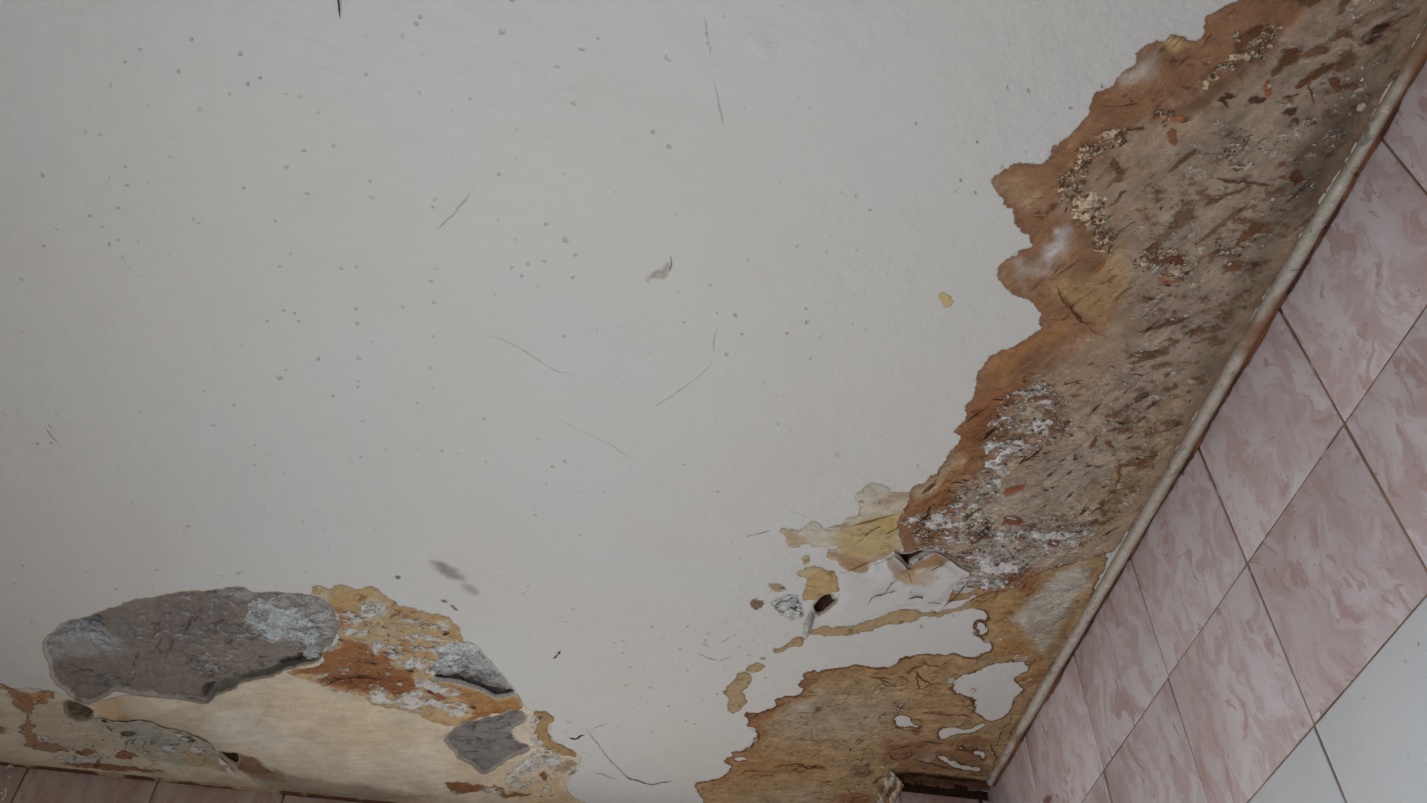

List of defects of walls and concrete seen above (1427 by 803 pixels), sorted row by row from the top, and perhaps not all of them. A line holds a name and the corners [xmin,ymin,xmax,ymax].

peeling [771,548,969,640]
spalling [42,586,340,777]
spalling [431,641,531,775]
spalling [876,769,991,803]